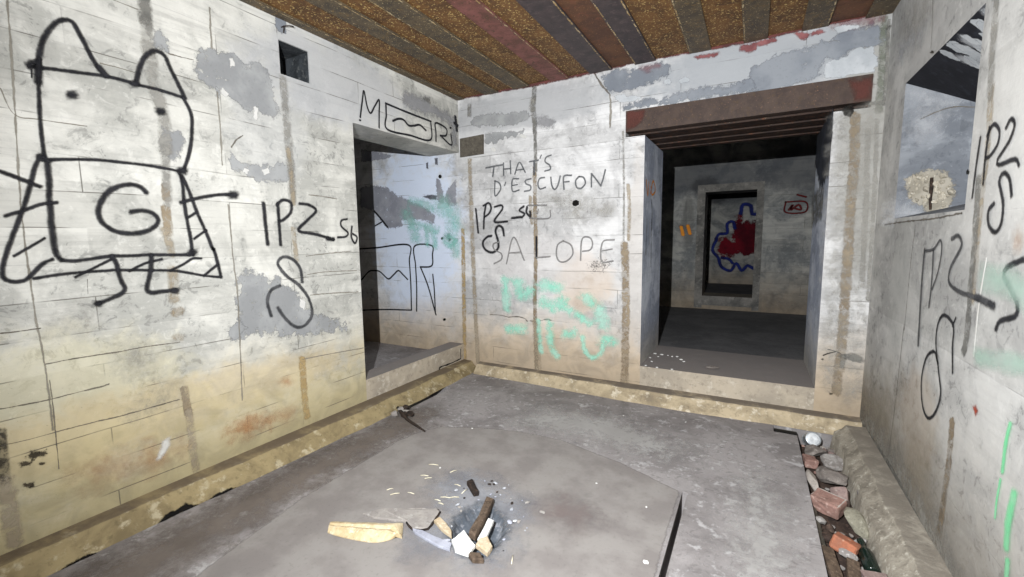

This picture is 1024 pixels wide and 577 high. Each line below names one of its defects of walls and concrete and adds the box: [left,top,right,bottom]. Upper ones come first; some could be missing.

flaking render [194,47,281,121]
flaking render [228,152,295,183]
corrosion [622,110,644,143]
flaking render [552,0,887,111]
flaking render [228,268,347,341]
corrosion [620,156,631,383]
leakage [0,429,23,548]
leakage [74,408,433,577]